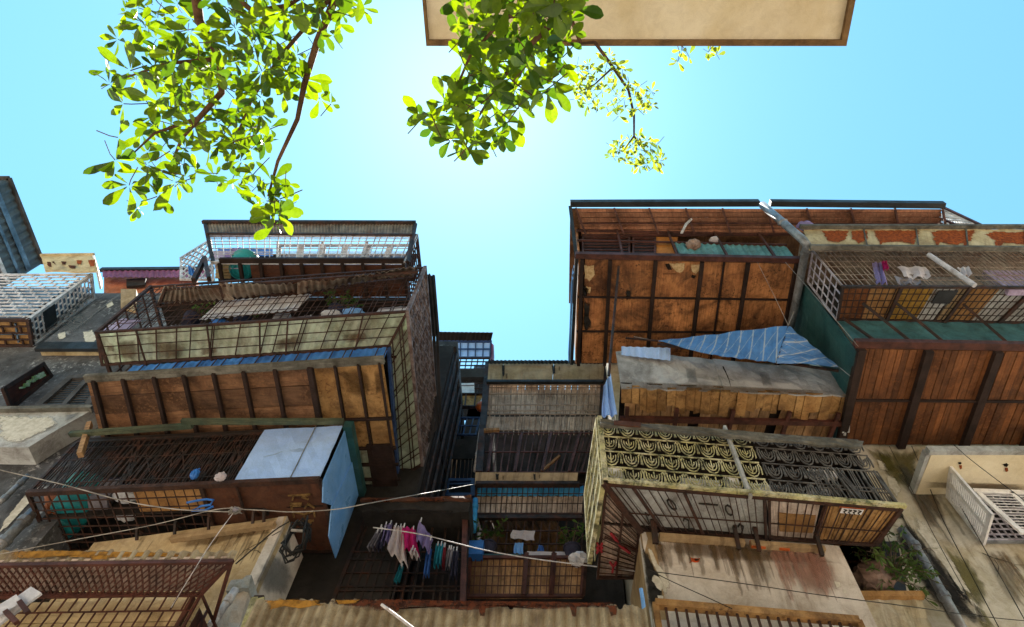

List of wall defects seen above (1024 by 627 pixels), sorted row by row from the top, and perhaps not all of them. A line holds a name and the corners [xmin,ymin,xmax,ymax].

leakage [684,543,829,588]